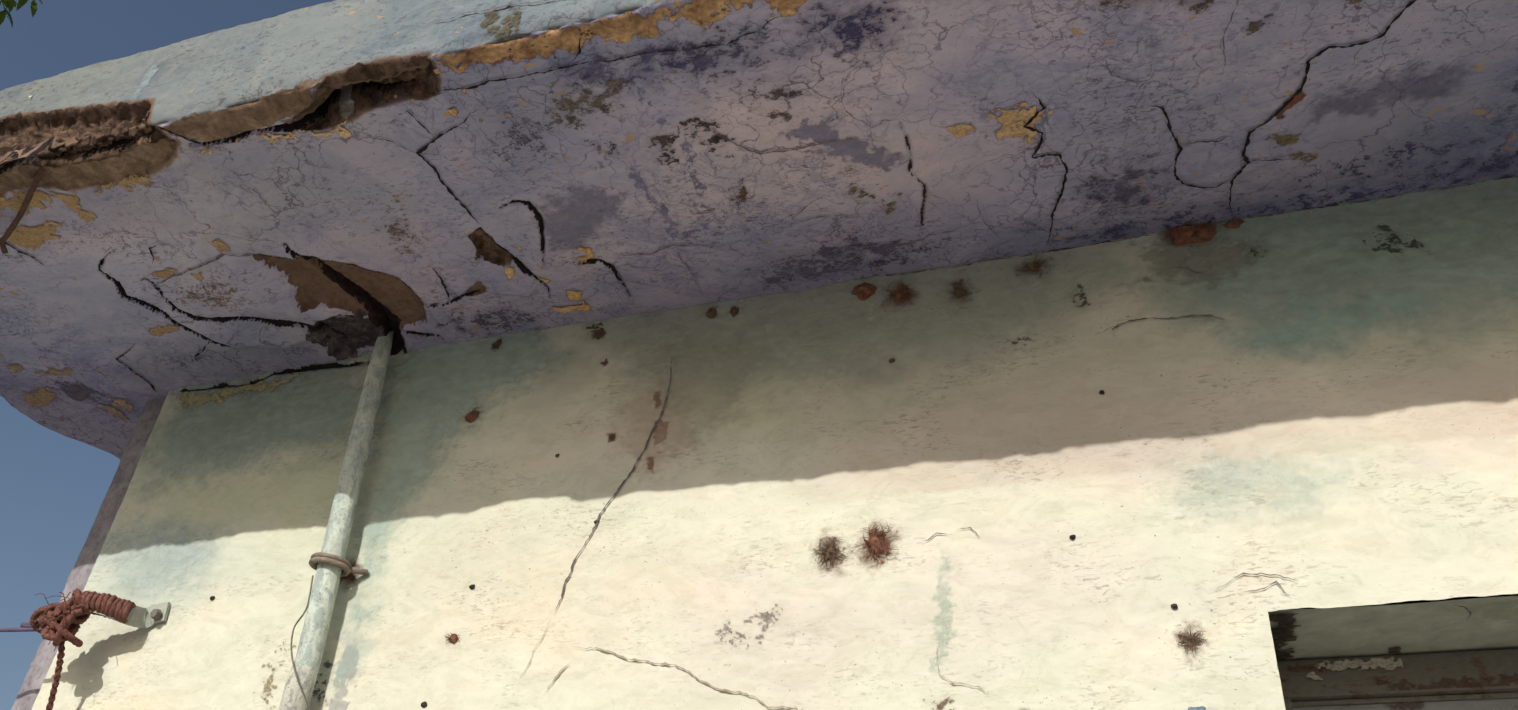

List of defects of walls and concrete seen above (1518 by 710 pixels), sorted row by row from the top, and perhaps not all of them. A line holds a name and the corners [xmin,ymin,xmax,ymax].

spalling [0,0,807,251]
crack [365,13,1212,308]
peeling [947,102,1053,146]
crack [1105,0,1417,225]
rust [1162,217,1248,247]
crack [98,245,370,393]
flaking render [212,240,427,361]
crack [406,269,479,337]
crack [1095,314,1224,335]
crack [520,357,798,710]
rust [814,521,898,571]
rust [1376,674,1518,710]